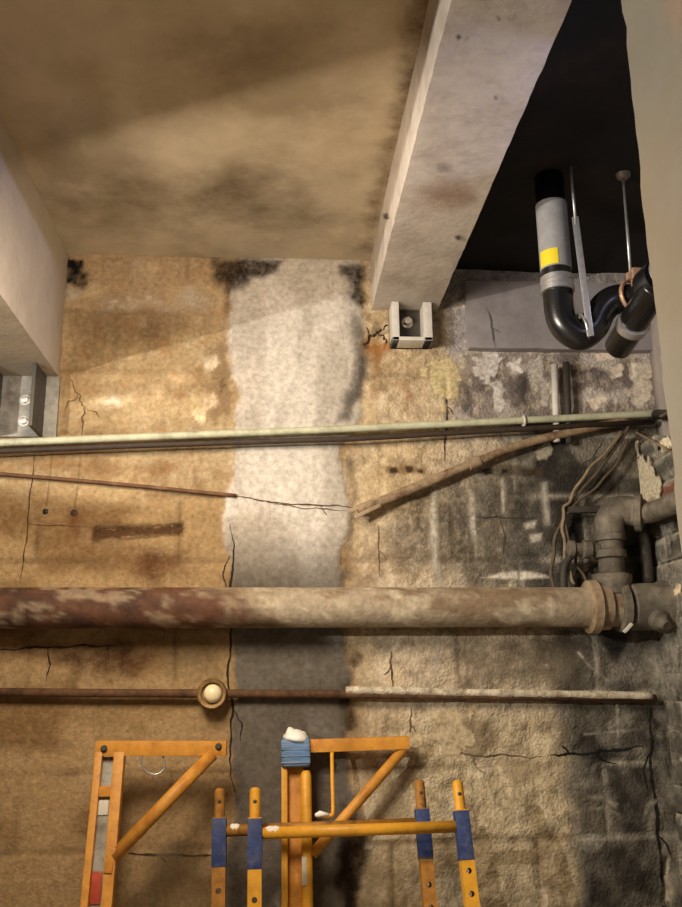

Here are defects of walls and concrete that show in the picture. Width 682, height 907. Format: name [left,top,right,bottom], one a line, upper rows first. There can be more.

water stain [65,260,87,298]
water stain [214,259,279,287]
water stain [341,266,365,305]
peeling [635,441,661,503]
crack [0,644,114,680]
crack [460,707,672,907]